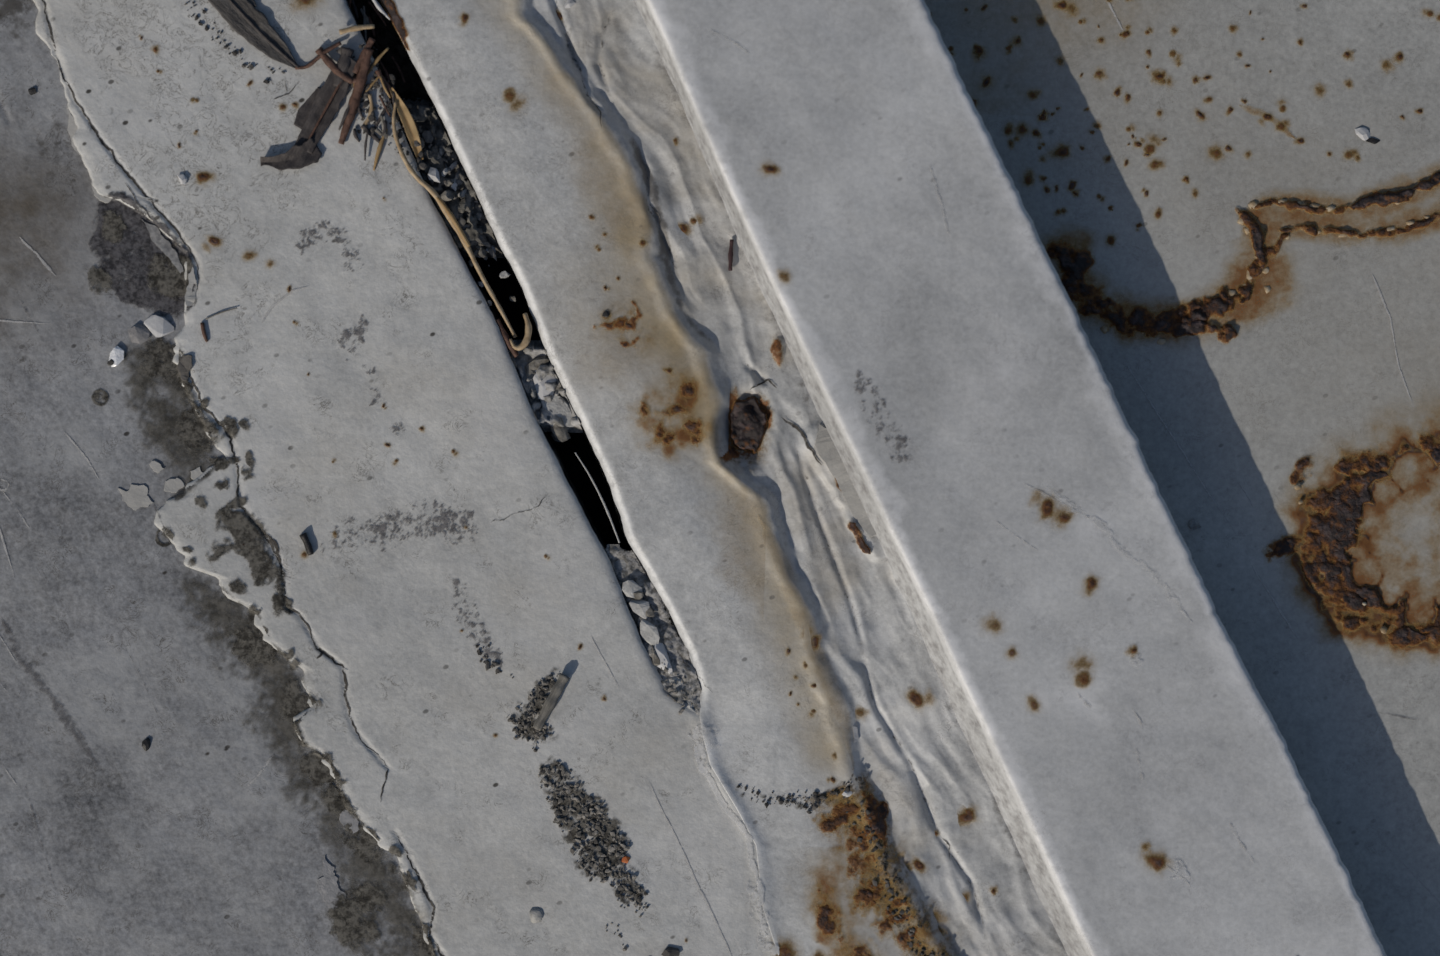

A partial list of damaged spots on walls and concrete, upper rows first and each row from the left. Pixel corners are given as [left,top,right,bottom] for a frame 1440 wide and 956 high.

crack [42,0,199,288]
spalling [107,315,174,367]
peeling [118,460,203,510]
peeling [142,220,197,306]
spalling [176,354,193,381]
crack [179,354,388,797]
crack [436,205,562,387]
crack [493,426,633,552]
corrosion [638,368,709,457]
corrosion [1046,171,1440,345]
corrosion [1265,416,1440,655]
corrosion [812,777,951,956]